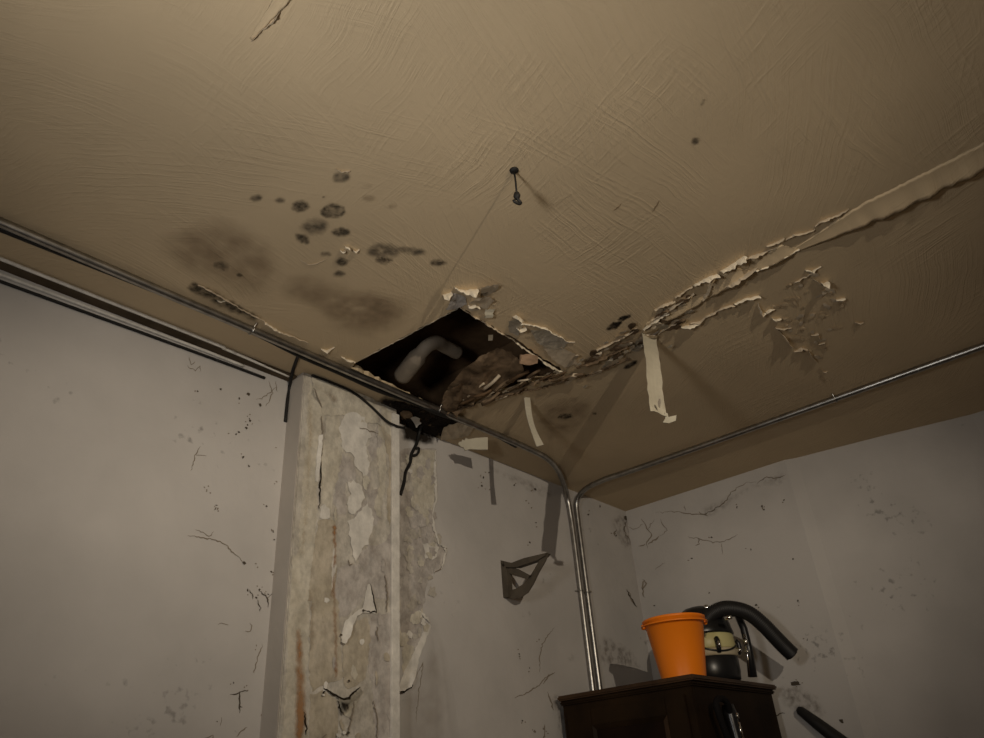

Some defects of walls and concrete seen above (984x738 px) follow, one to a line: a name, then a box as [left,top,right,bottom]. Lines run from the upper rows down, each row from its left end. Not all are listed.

damp [297,204,349,243]
spalling [190,283,308,343]
spalling [321,209,849,385]
crack [247,382,278,407]
crack [195,529,246,565]
flaking render [282,377,473,738]
crack [614,475,784,607]
crack [206,591,272,738]
corrosion [296,640,304,738]